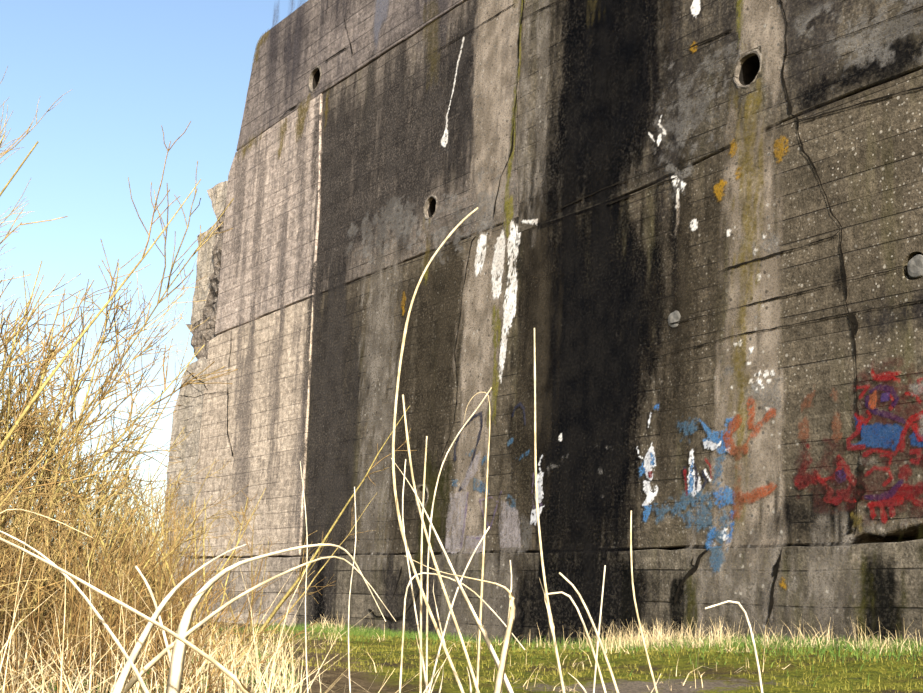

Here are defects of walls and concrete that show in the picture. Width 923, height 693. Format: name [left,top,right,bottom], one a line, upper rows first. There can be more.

leakage [269,0,304,95]
leakage [233,138,266,499]
leakage [269,240,286,440]
leakage [295,0,923,645]
crack [779,0,861,458]
crack [674,548,710,604]
crack [766,547,783,636]